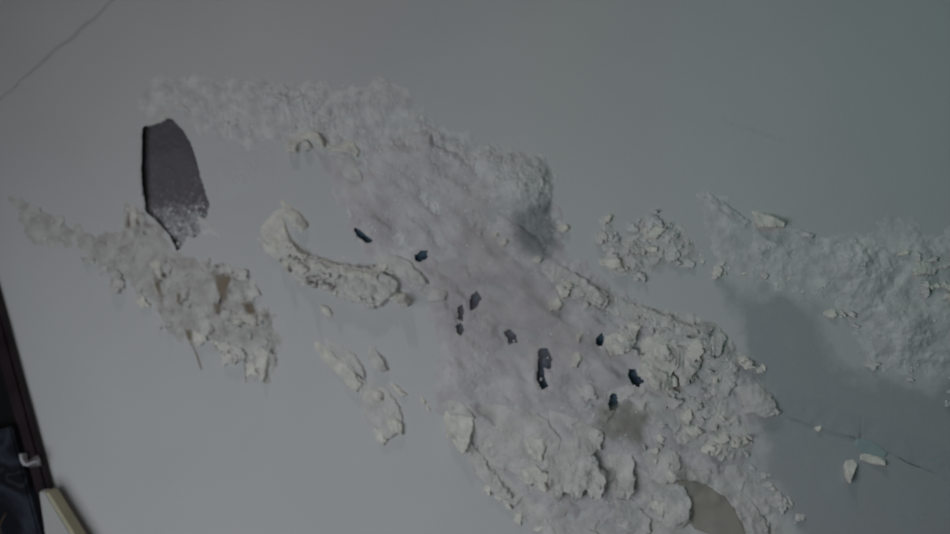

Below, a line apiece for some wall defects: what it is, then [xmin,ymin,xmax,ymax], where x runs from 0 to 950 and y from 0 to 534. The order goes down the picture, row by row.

peeling [8,103,282,384]
peeling [257,200,448,318]
peeling [315,338,409,445]
peeling [421,209,806,534]
spalling [843,438,888,484]